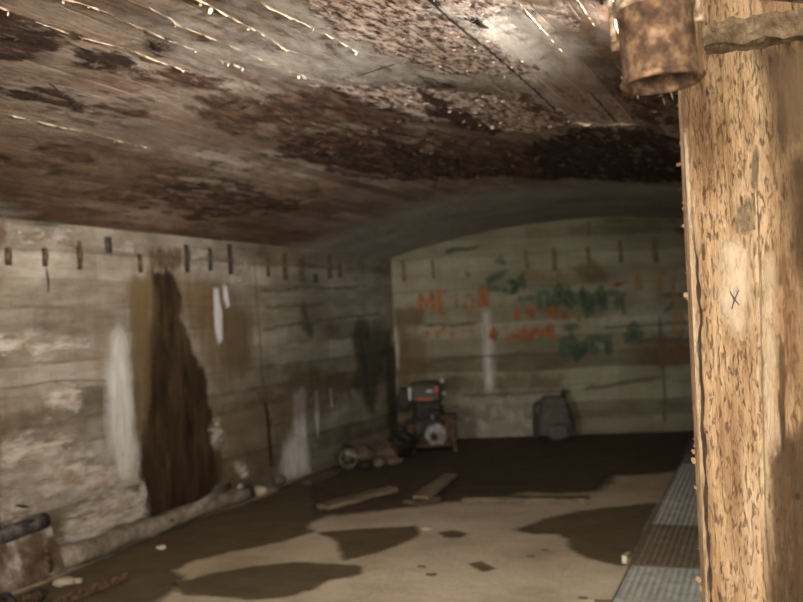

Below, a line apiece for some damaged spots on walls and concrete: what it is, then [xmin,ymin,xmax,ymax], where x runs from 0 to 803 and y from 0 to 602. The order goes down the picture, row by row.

spalling [82,165,307,221]
spalling [0,0,691,212]
damp [108,270,247,517]
damp [15,388,690,602]
damp [354,320,398,435]
damp [484,313,493,392]